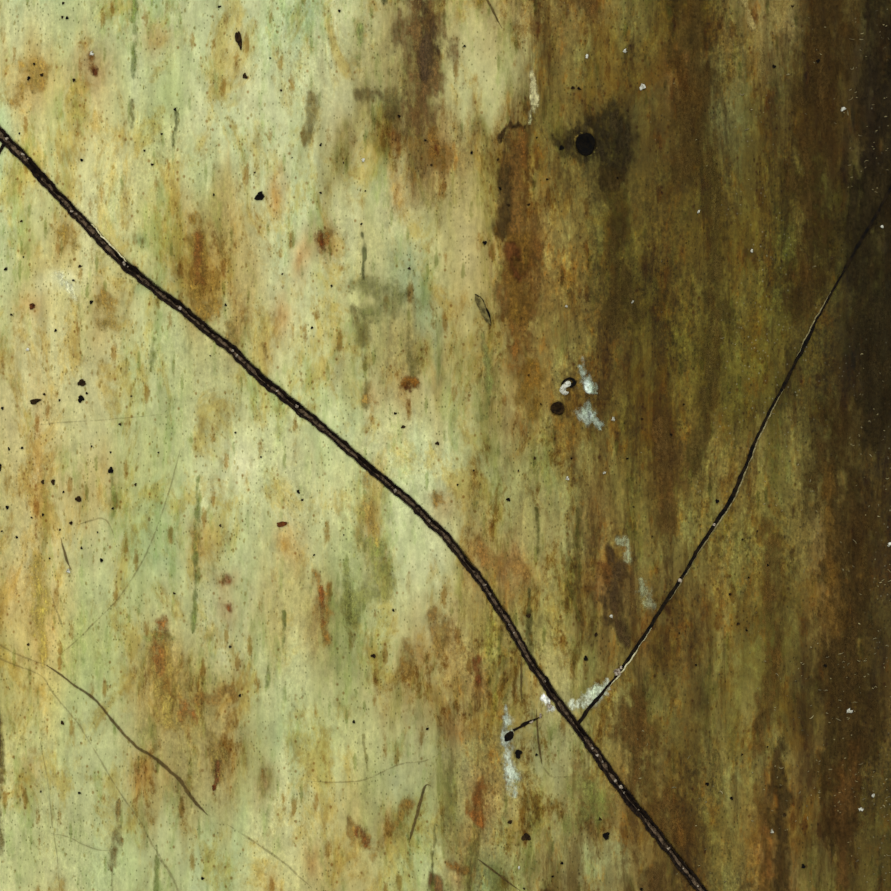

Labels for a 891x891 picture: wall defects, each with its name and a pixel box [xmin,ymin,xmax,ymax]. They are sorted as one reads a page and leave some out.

crack [0,127,707,891]
water stain [552,99,638,330]
crack [578,186,891,724]
water stain [785,0,891,890]
water stain [768,738,793,891]